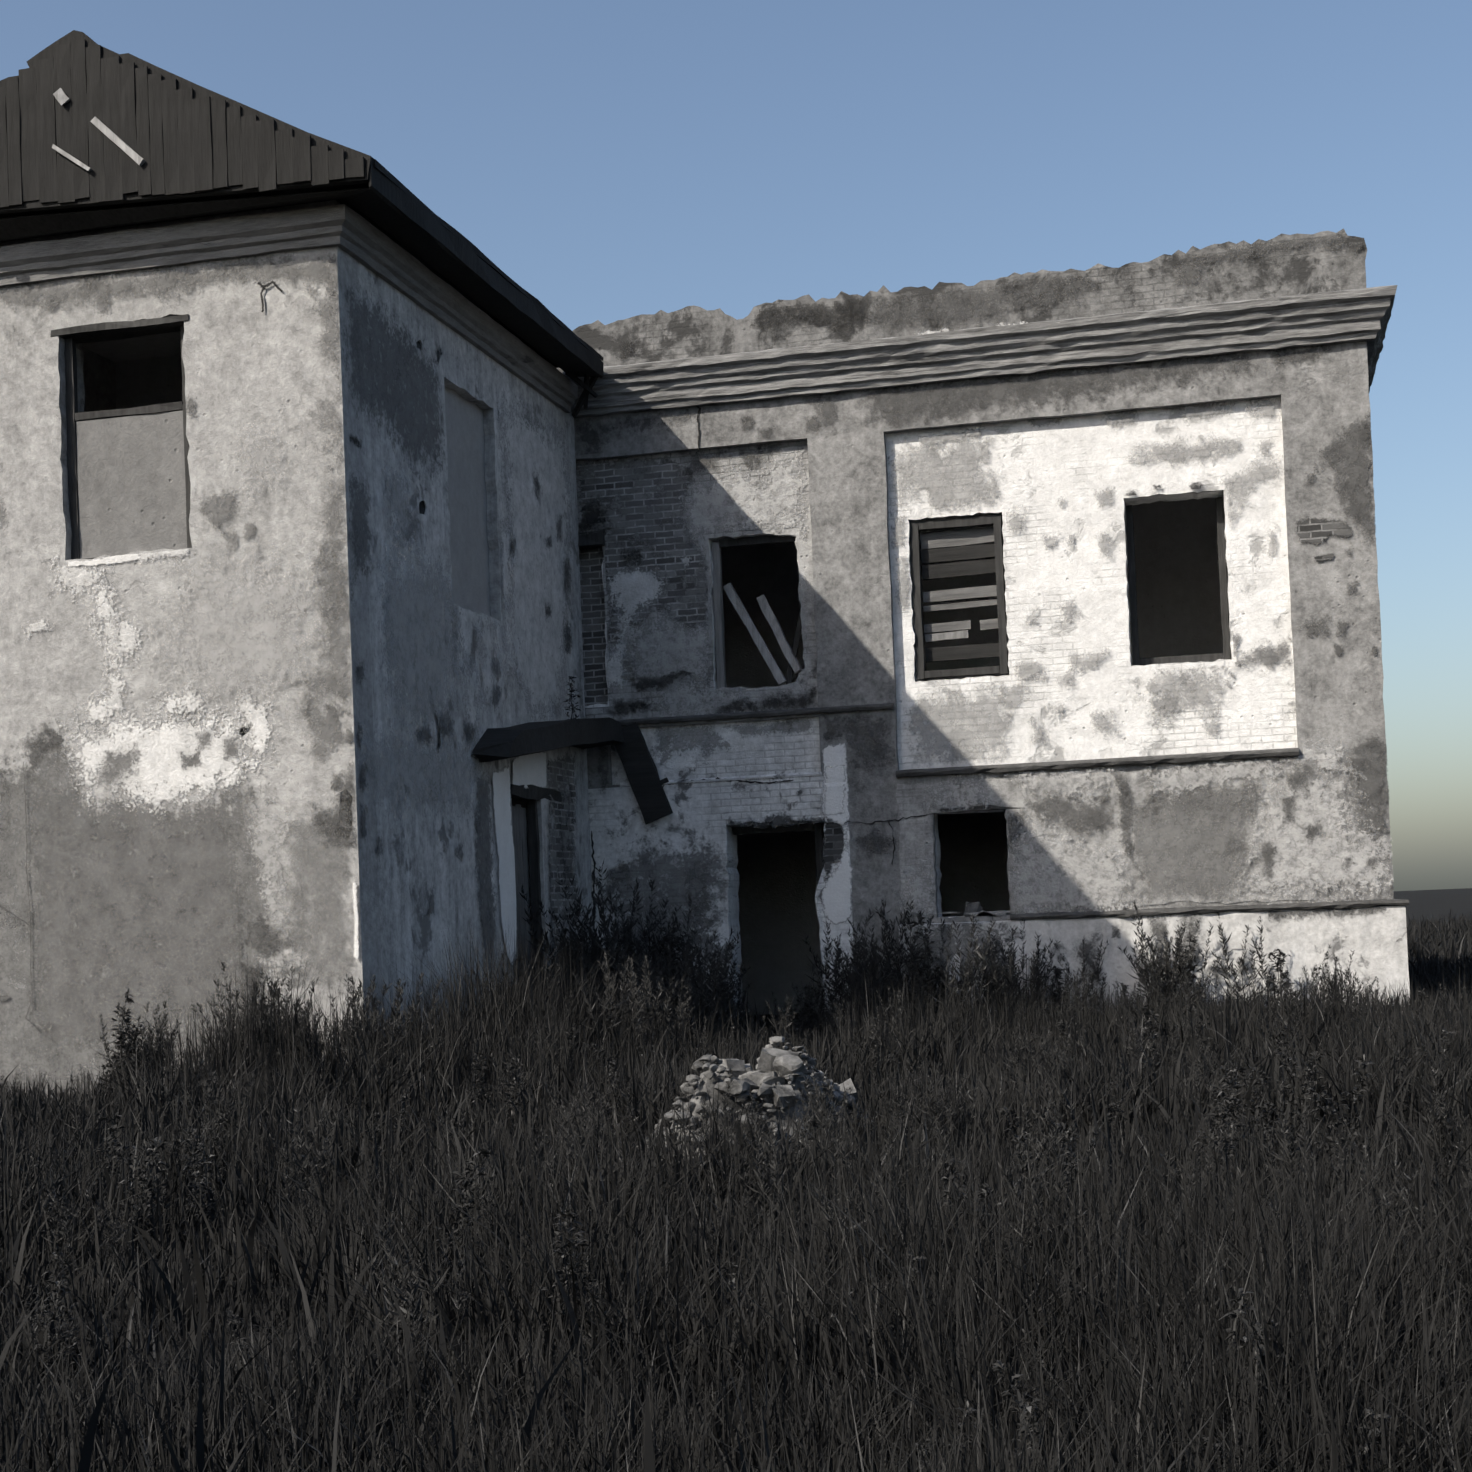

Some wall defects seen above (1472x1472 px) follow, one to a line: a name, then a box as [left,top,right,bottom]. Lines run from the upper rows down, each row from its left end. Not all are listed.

damp [867,275,1097,335]
damp [1175,234,1362,284]
damp [0,253,445,764]
peeling [497,398,708,719]
peeling [887,438,1000,607]
peeling [1129,435,1280,522]
flaking render [1296,517,1352,562]
peeling [1231,634,1292,677]
peeling [29,687,276,814]
damp [1007,774,1132,860]
crack [0,762,54,1041]
damp [0,722,289,1102]